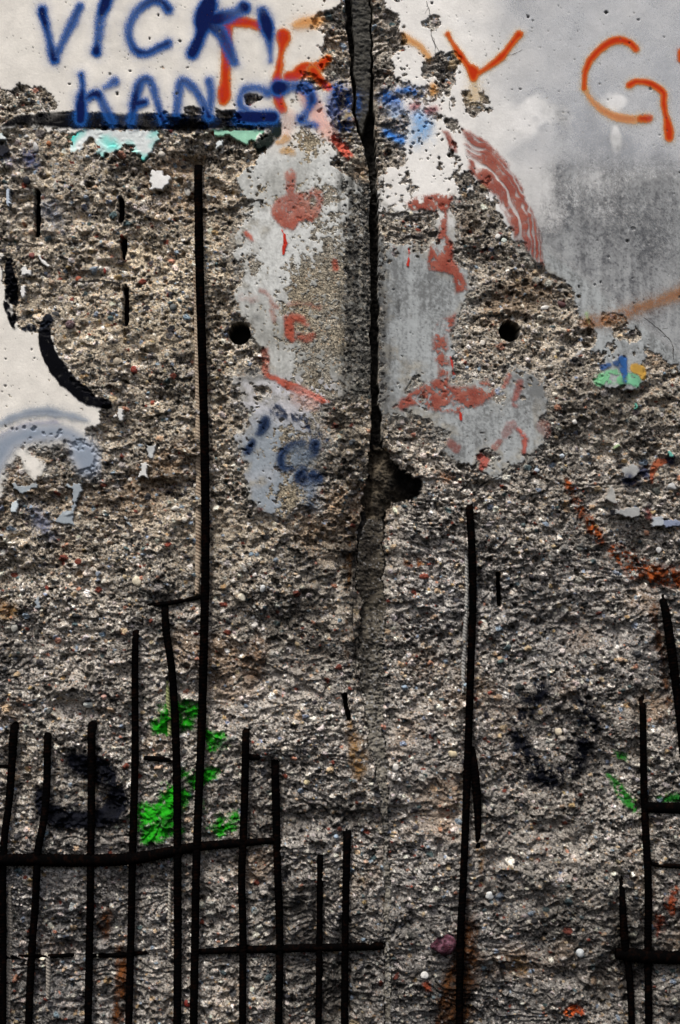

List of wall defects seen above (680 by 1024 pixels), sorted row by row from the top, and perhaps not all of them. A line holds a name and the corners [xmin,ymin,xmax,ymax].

spalling [461,91,493,118]
crack [378,209,436,217]
spalling [371,0,463,327]
spalling [0,0,423,946]
corrosion [565,478,680,588]
crack [352,543,364,705]
spalling [381,164,680,1024]
spalling [6,847,239,1024]
spalling [246,952,276,1024]
spalling [282,951,342,1024]
spalling [348,948,386,1024]